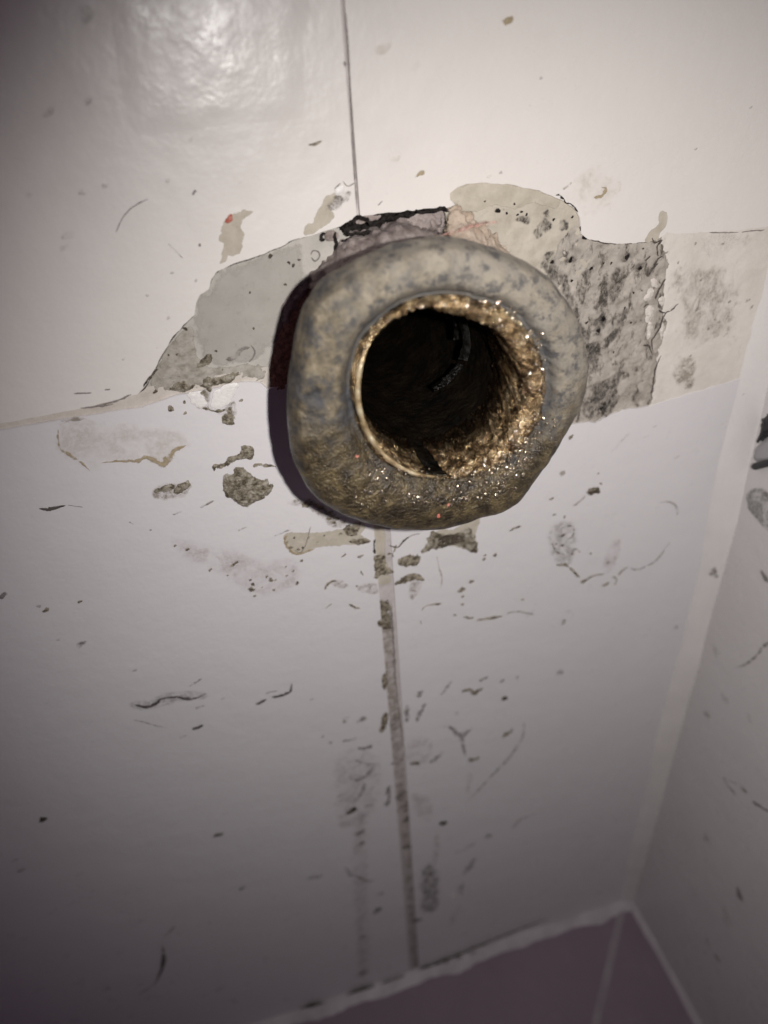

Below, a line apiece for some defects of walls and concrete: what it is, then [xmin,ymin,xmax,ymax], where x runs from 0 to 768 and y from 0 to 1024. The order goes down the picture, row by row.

spalling [141,183,678,423]
peeling [283,500,370,555]